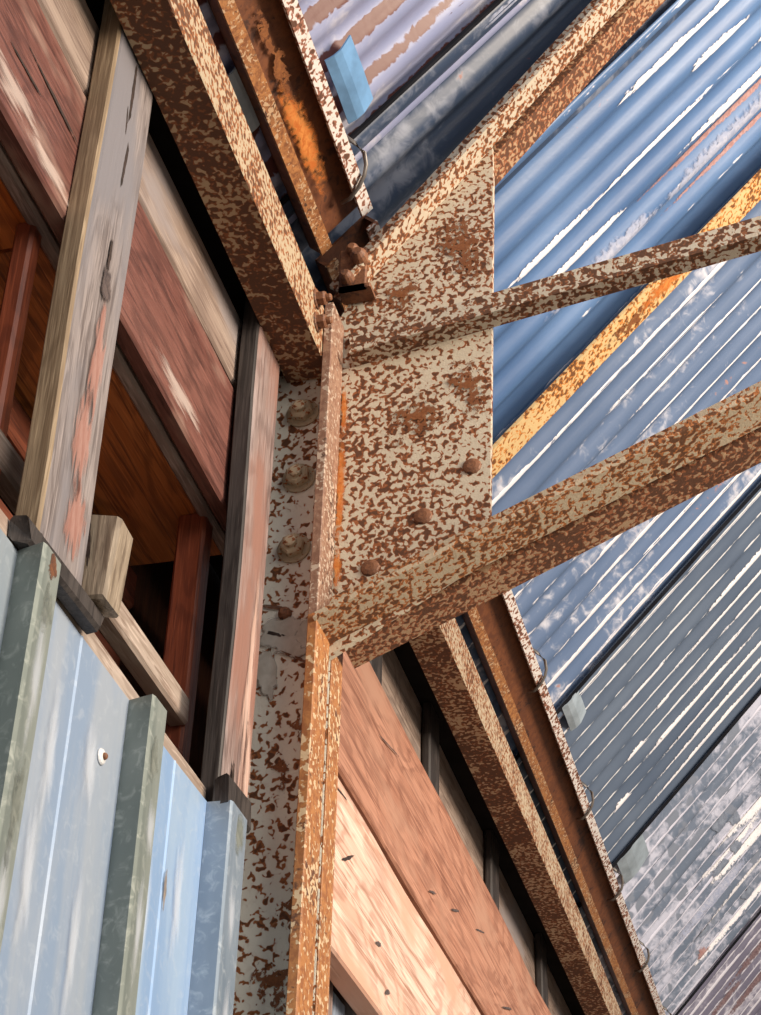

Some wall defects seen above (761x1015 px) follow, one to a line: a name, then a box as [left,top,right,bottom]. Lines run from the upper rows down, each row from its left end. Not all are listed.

corrosion [252,7,324,192]
corrosion [435,212,490,289]
corrosion [380,272,421,320]
corrosion [609,273,683,347]
corrosion [387,360,487,447]
corrosion [335,444,346,538]
corrosion [333,550,342,586]
peeling [238,594,308,797]
corrosion [271,751,290,791]